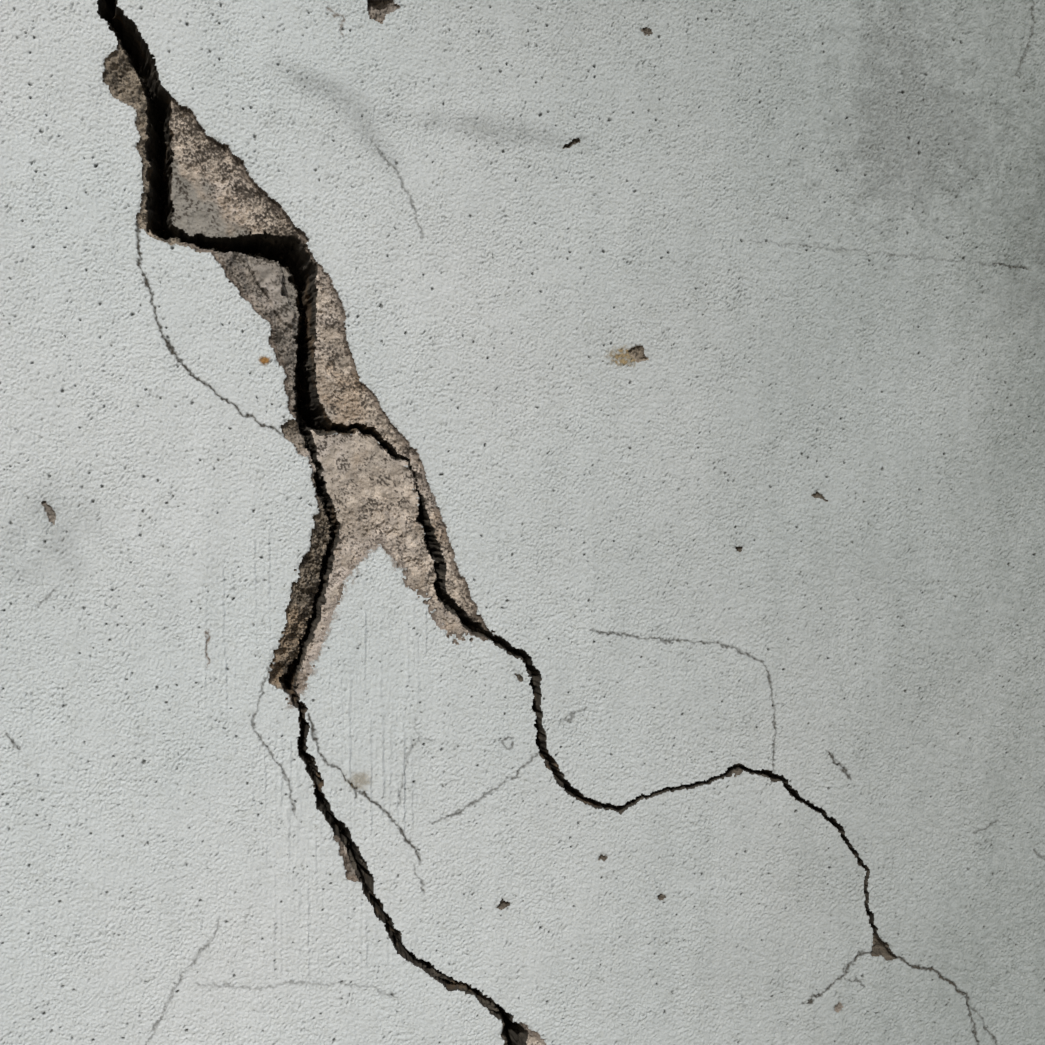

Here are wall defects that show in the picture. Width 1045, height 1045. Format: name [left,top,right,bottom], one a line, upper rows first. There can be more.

spalling [102,34,496,705]
crack [97,0,878,1045]
spalling [519,1022,546,1045]
crack [896,956,996,1043]